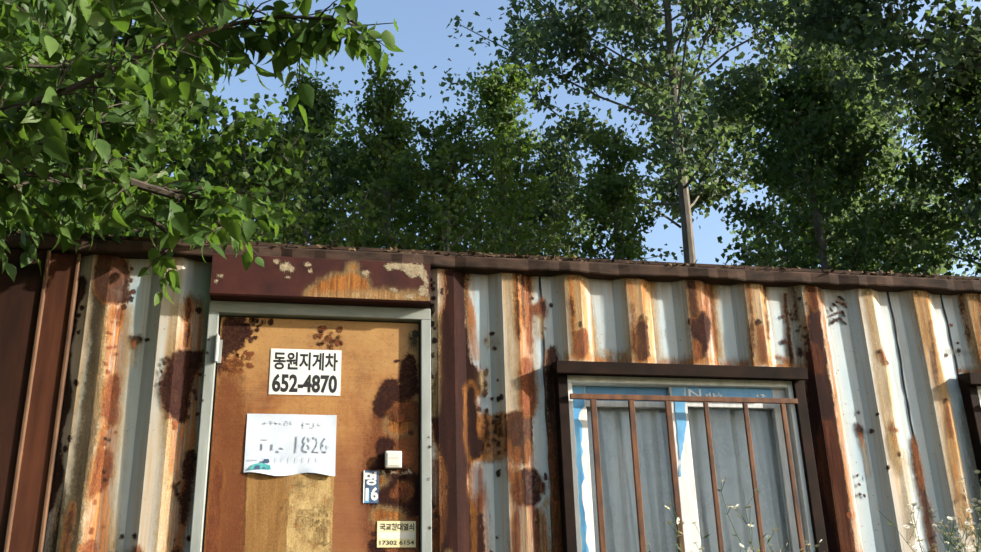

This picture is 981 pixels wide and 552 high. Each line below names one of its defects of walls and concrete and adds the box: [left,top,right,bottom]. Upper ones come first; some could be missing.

rust [80,303,150,552]
rust [155,295,247,552]
peeling [384,262,429,300]
rust [305,264,508,552]
rust [509,273,938,552]
rust [912,290,981,529]